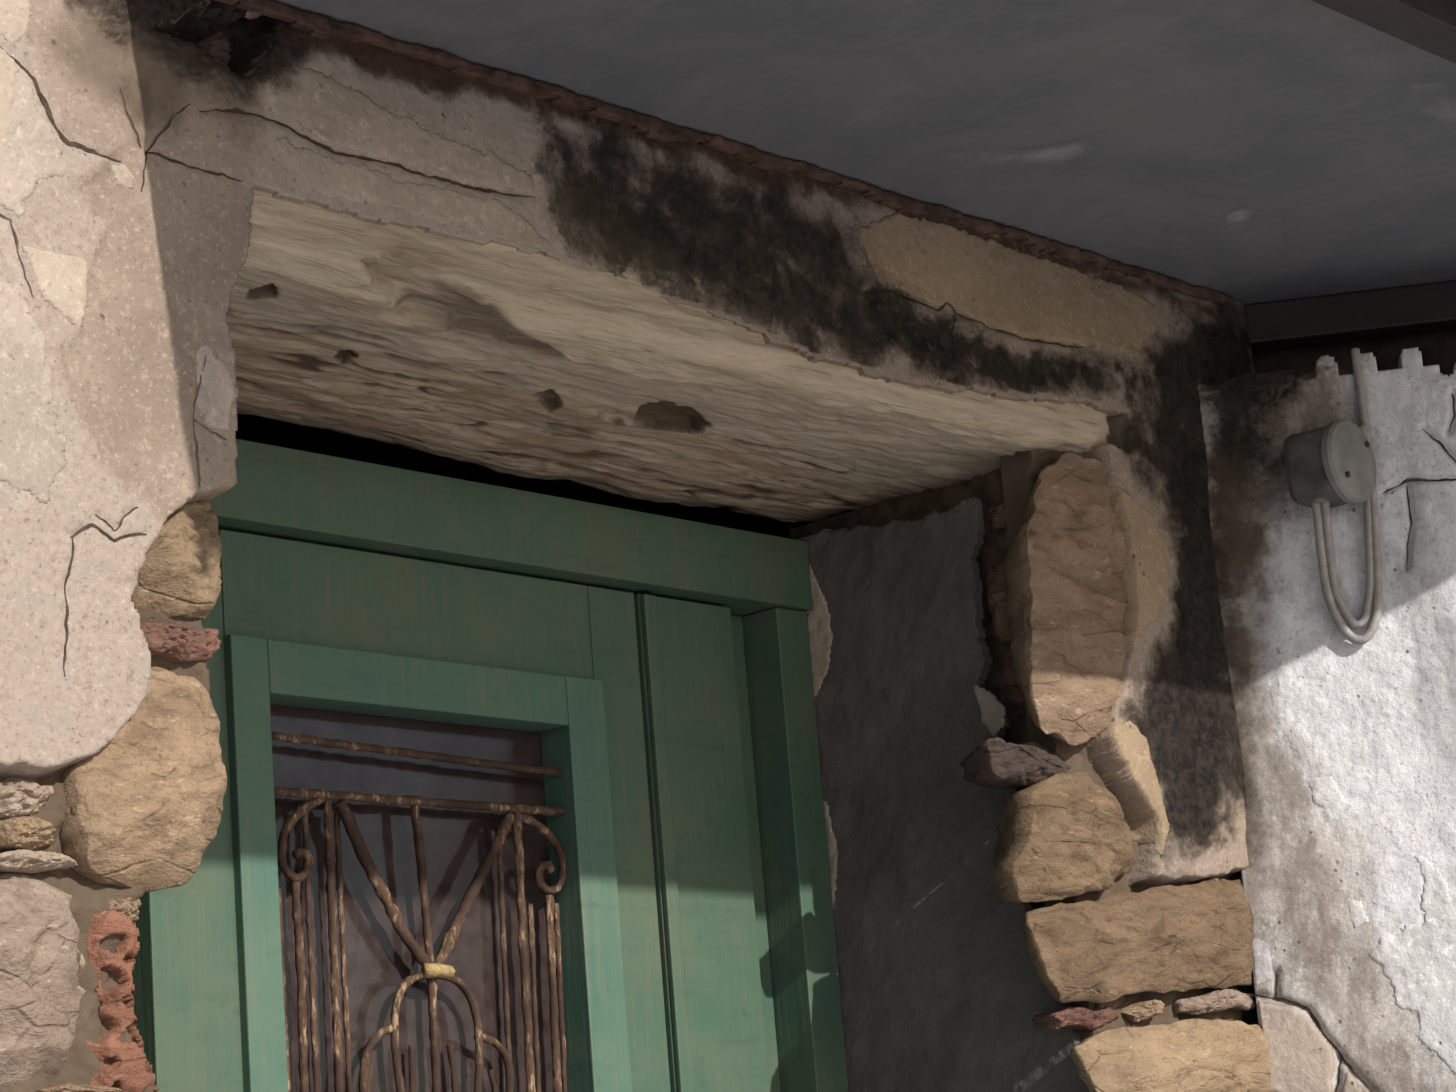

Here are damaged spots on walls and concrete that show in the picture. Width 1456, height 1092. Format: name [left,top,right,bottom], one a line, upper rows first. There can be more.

damp [68,0,322,93]
crack [0,46,535,198]
crack [0,213,34,298]
crack [193,356,227,487]
damp [536,110,1320,852]
crack [1383,393,1456,568]
crack [64,506,147,676]
spalling [0,500,227,1092]
spalling [960,450,1273,1092]
peeling [1307,776,1347,814]
crack [1252,973,1372,1092]
peeling [1347,855,1456,1074]